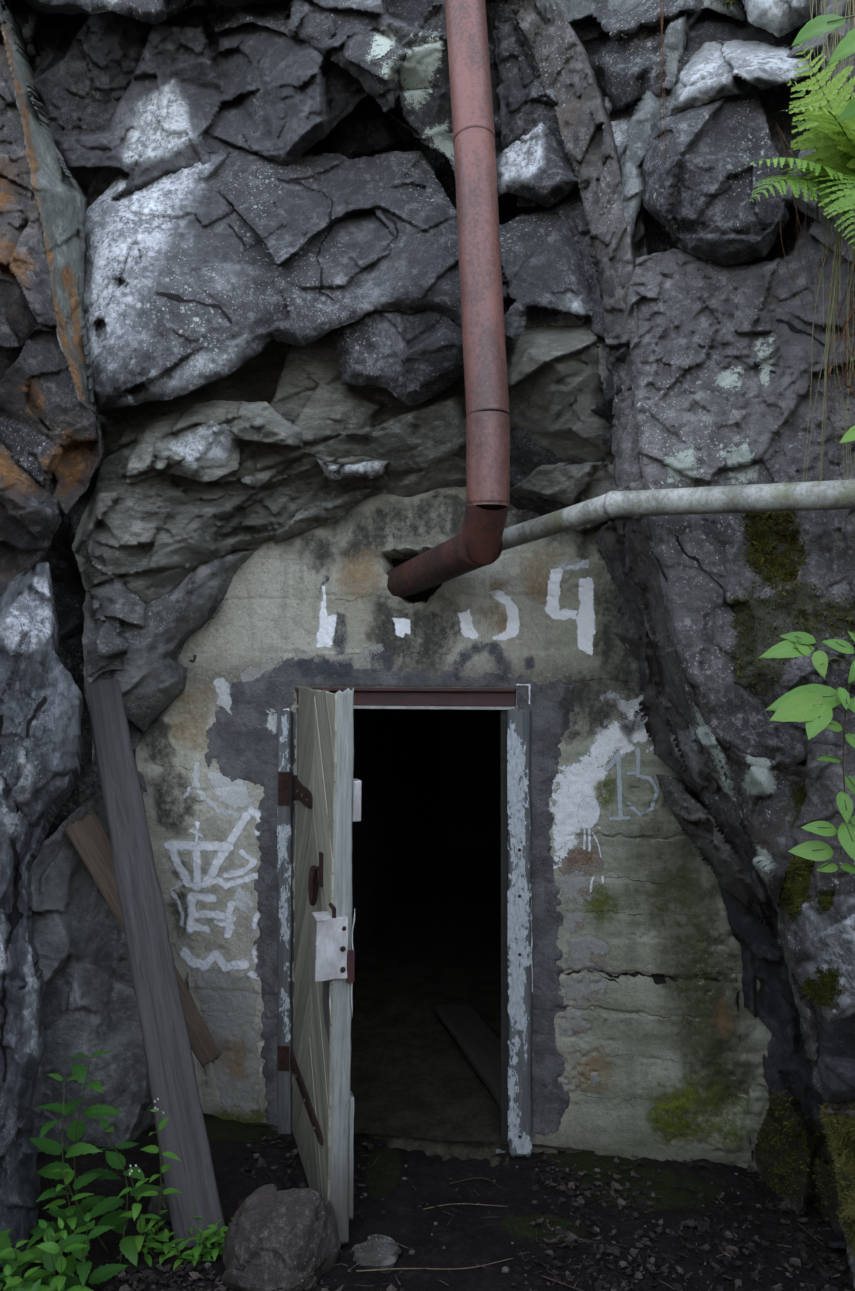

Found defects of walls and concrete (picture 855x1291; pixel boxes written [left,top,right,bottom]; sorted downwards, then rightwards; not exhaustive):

water stain [368,596,459,669]
peeling [213,648,313,715]
peeling [267,709,290,771]
peeling [207,772,257,810]
peeling [277,824,291,1042]
peeling [507,690,658,1154]
crack [563,969,726,1019]